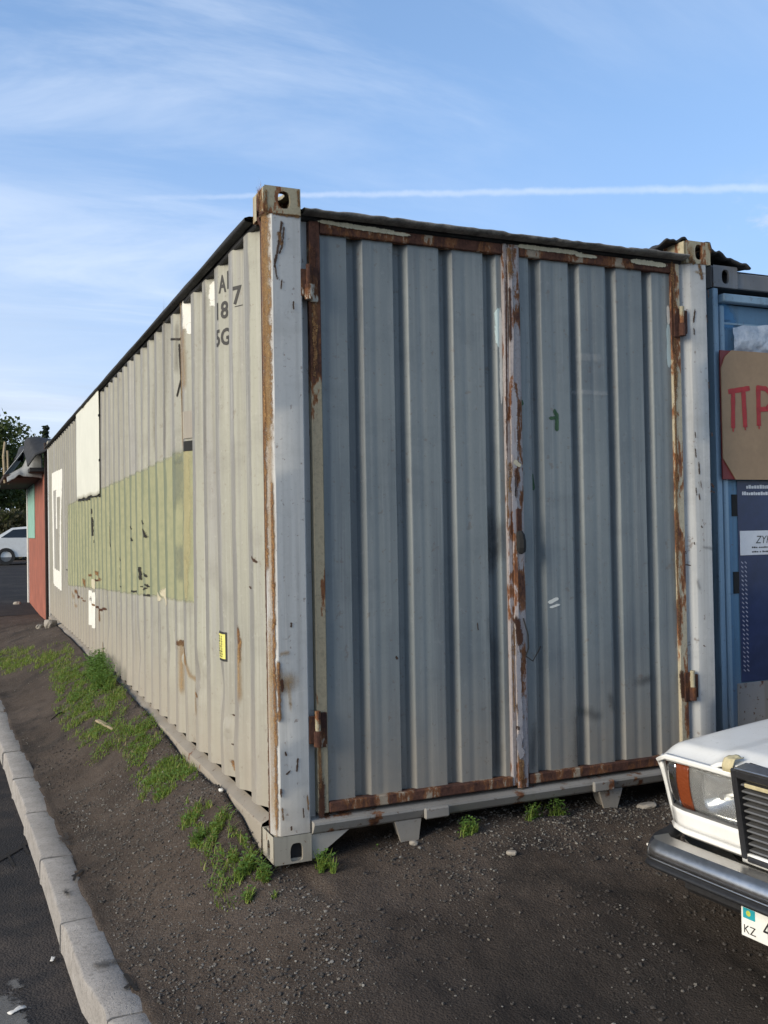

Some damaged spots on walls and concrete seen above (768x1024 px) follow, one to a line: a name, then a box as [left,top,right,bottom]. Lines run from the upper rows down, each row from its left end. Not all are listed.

rust [256,184,300,836]
rust [505,247,521,527]
rust [671,262,680,644]
rust [176,640,197,697]
rust [512,617,524,730]